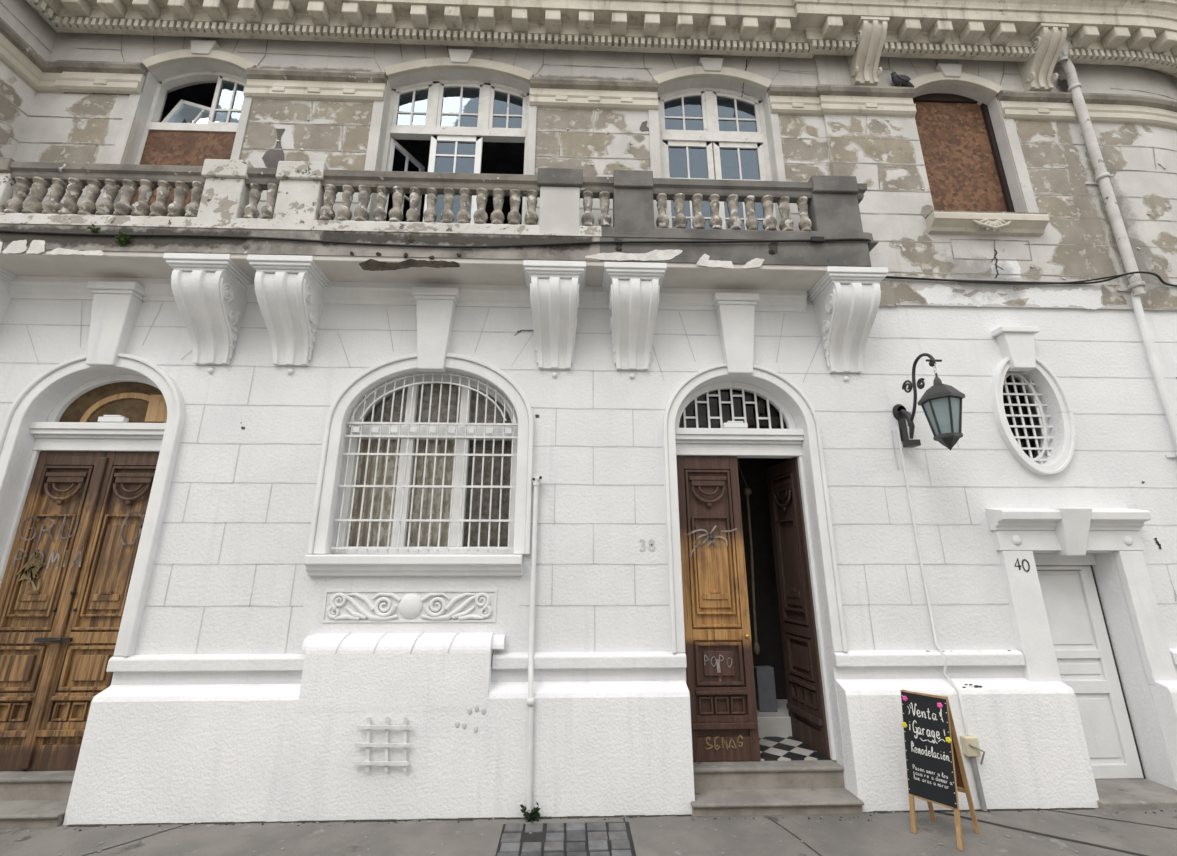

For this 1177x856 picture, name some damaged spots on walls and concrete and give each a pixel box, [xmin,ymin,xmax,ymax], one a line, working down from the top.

peeling [0,76,23,158]
peeling [38,93,118,163]
peeling [240,99,373,170]
peeling [535,108,651,176]
peeling [779,115,925,192]
peeling [997,120,1177,310]
spalling [350,238,461,271]
peeling [879,205,992,306]
crack [991,249,1004,278]